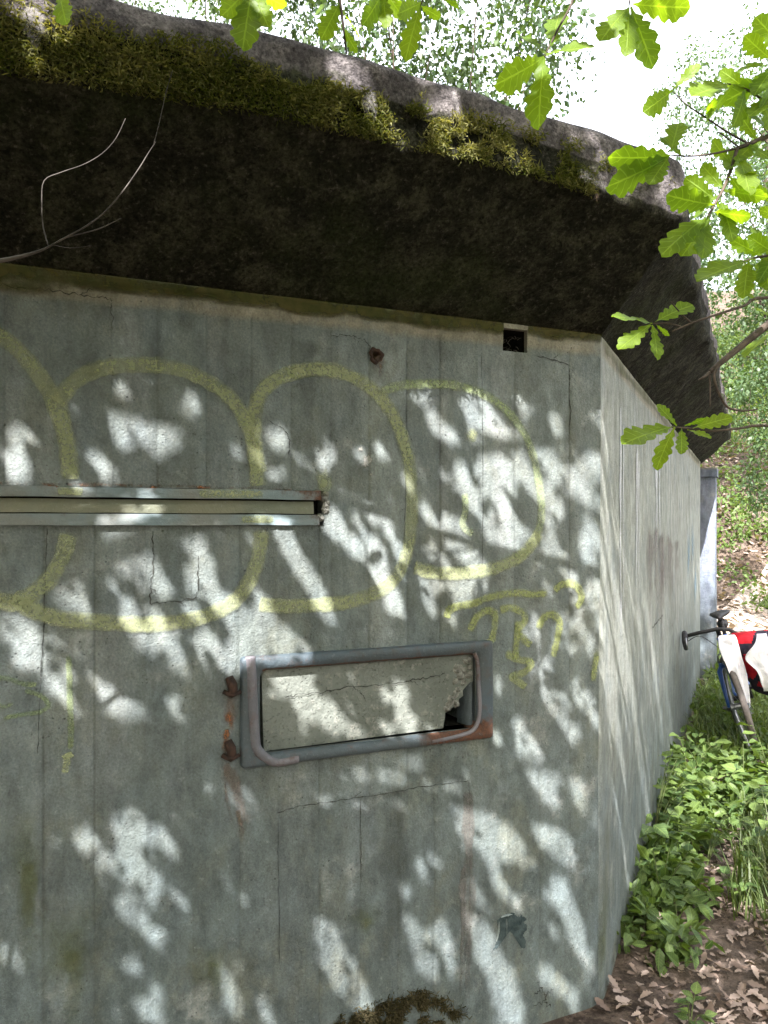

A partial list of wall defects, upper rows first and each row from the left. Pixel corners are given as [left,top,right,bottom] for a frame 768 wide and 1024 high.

crack [149,535,199,606]
crack [285,673,445,699]
spalling [444,657,473,712]
crack [278,781,470,962]